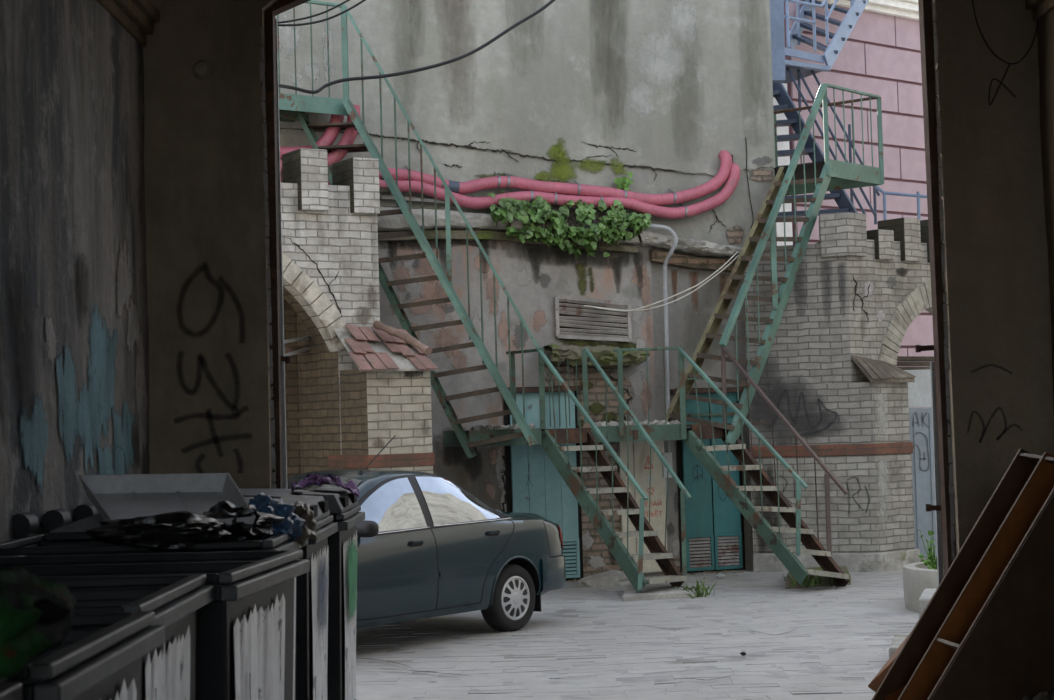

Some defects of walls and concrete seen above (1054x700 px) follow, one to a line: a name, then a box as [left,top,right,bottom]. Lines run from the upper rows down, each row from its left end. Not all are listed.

crack [339,132,709,181]
peeling [17,240,148,495]
crack [284,237,342,317]
flaking render [390,246,551,369]
leakage [516,242,643,295]
spalling [544,263,653,428]
crack [853,277,870,319]
spalling [445,446,507,512]
spalling [579,442,621,532]
spalling [581,507,622,577]